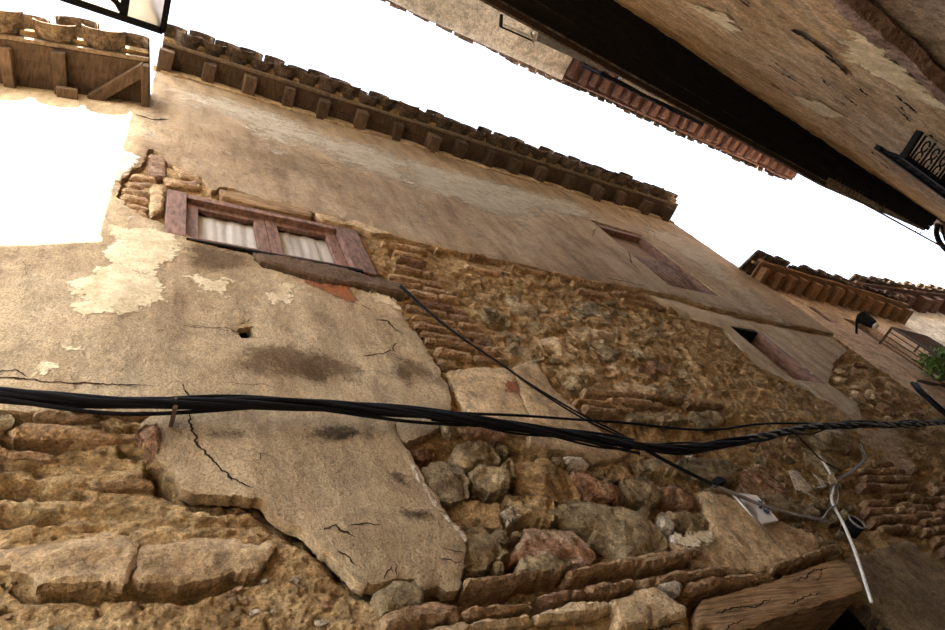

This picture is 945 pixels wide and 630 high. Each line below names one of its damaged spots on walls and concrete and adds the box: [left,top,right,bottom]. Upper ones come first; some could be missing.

peeling [41,146,202,320]
peeling [175,273,254,299]
peeling [261,281,316,307]
water stain [241,346,358,381]
spalling [370,241,726,434]
spalling [829,356,925,421]
spalling [0,409,162,469]
crack [182,384,256,490]
spalling [83,479,154,494]
crack [324,522,380,566]
spalling [370,426,945,630]
spalling [228,586,275,616]